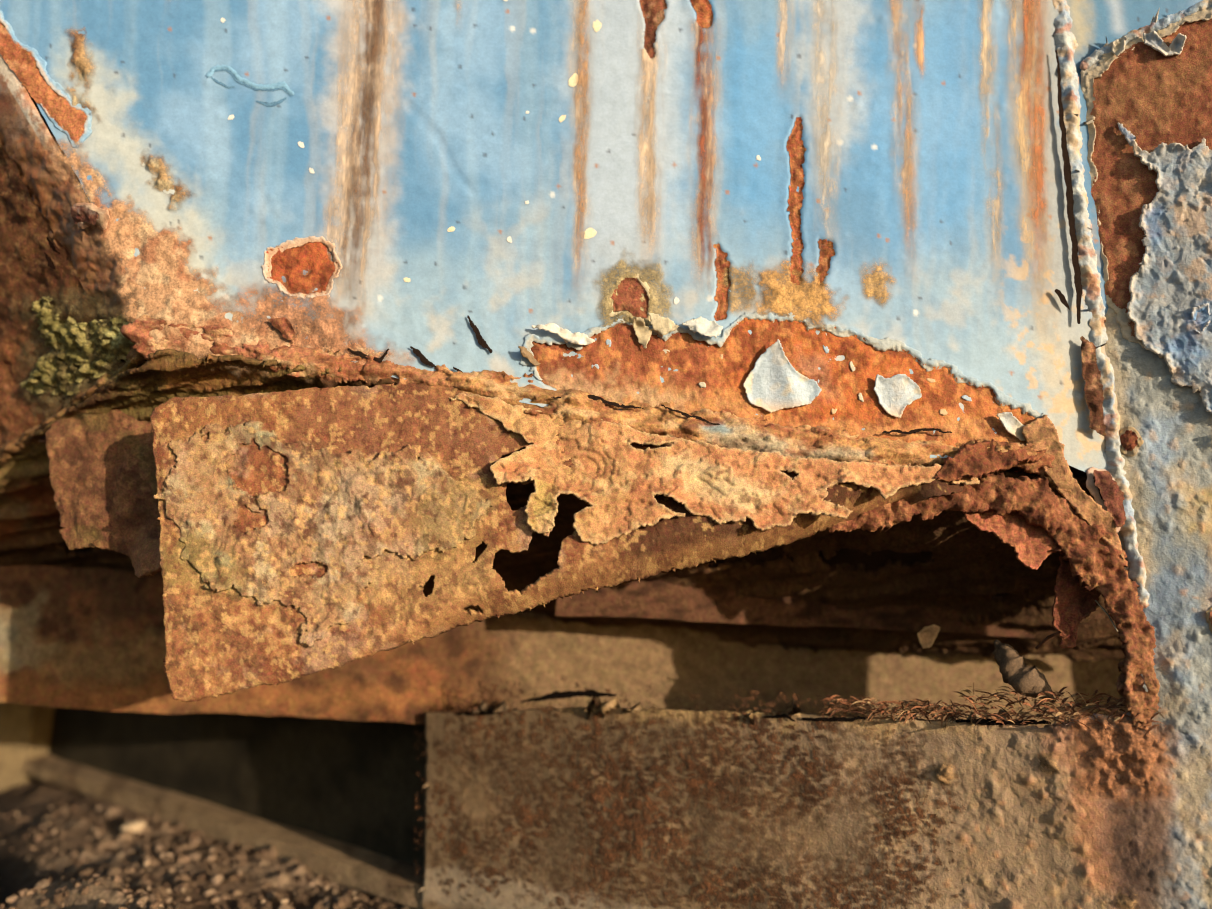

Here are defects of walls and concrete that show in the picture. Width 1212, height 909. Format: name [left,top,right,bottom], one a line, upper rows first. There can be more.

rust [54,0,393,369]
rust [639,42,658,234]
rust [695,22,716,267]
rust [816,51,834,218]
crack [1055,50,1083,324]
rust [1084,7,1212,414]
rust [449,260,1049,546]
rust [1080,336,1106,436]
rust [1060,709,1175,909]